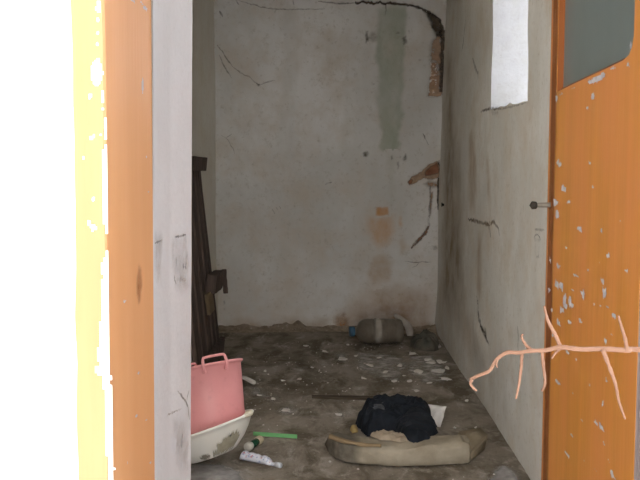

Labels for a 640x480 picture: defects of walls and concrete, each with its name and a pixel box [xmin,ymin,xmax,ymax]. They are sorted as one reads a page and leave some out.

crack [321,0,444,37]
flaking render [427,30,445,98]
flaking render [408,161,440,186]
crack [430,162,440,209]
damp [218,0,532,480]
crack [411,226,429,263]
peeling [548,281,585,327]